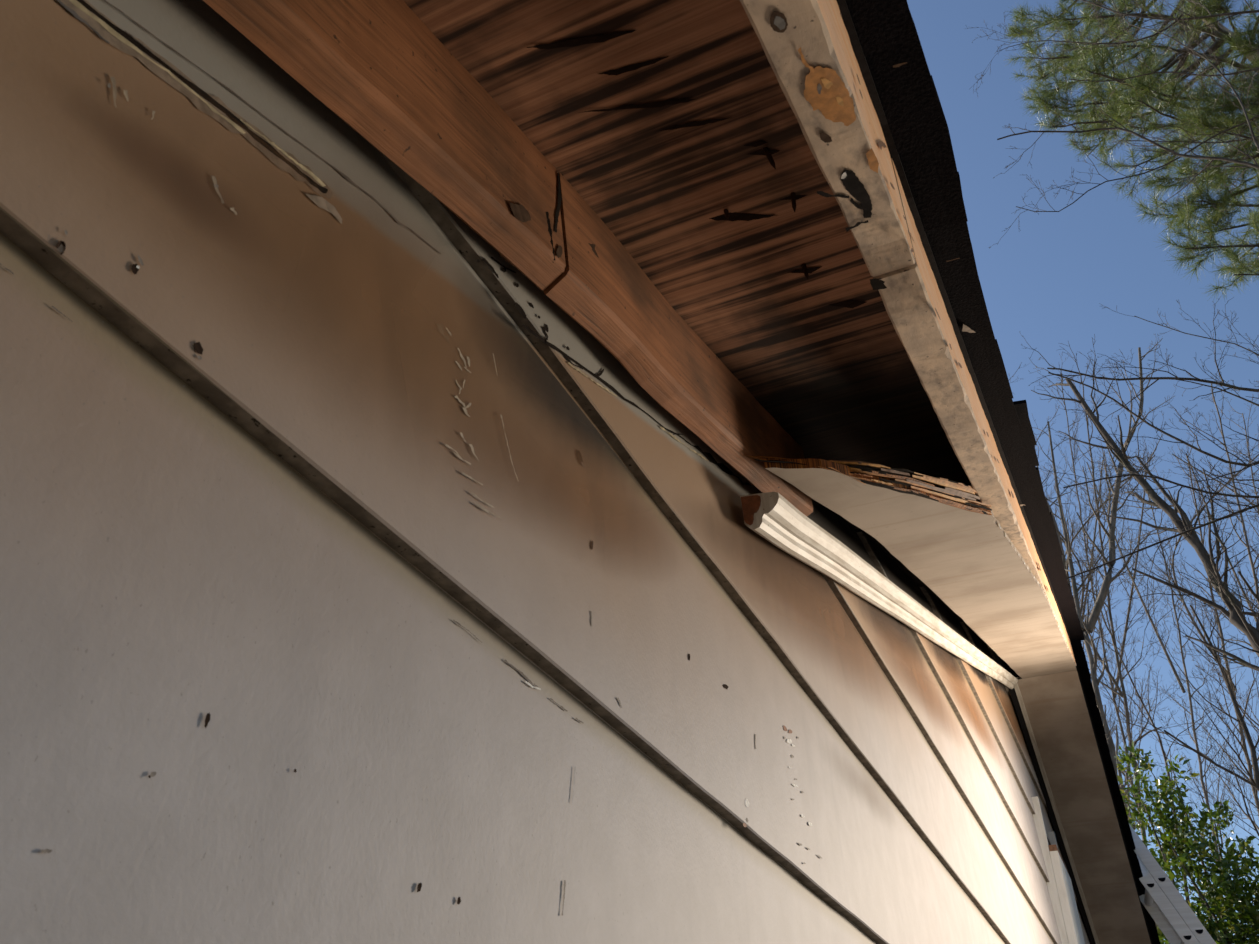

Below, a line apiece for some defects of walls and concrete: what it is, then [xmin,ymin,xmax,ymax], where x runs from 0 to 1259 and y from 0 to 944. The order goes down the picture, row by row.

crack [546,173,563,263]
damp [476,257,519,287]
damp [515,302,549,332]
damp [455,348,472,417]